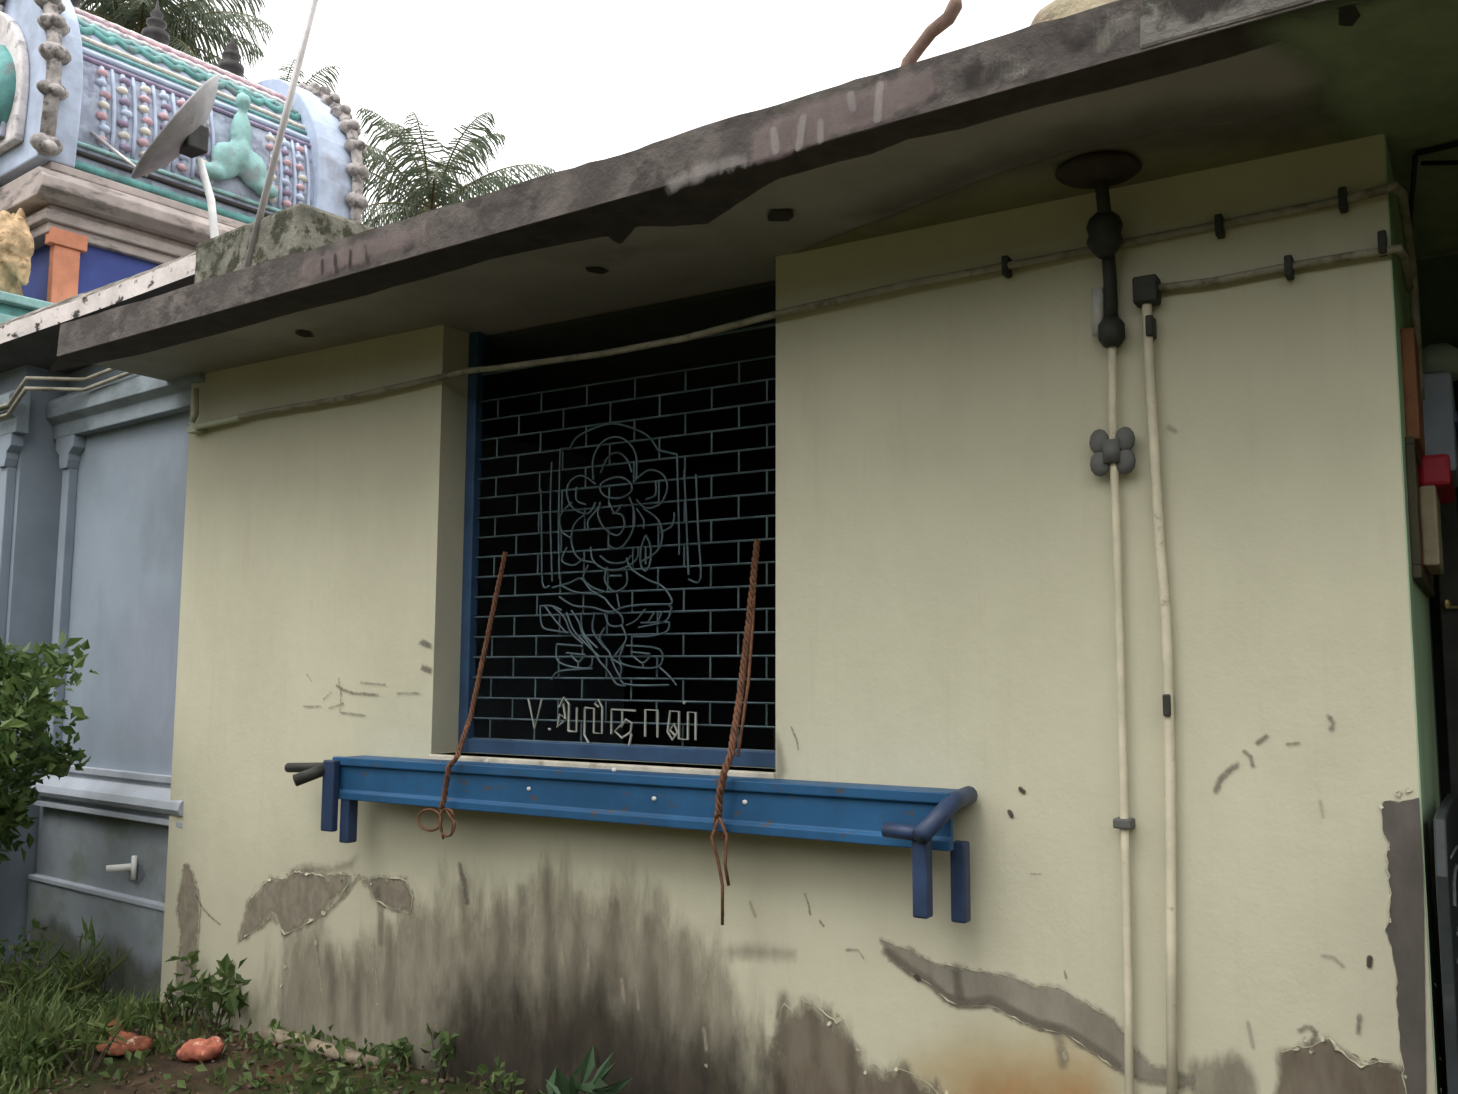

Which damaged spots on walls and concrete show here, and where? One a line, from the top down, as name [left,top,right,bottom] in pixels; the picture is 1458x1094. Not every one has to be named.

peeling [174,861,214,998]
peeling [238,869,413,942]
damp [280,885,948,1094]
flaking render [1379,786,1444,1094]